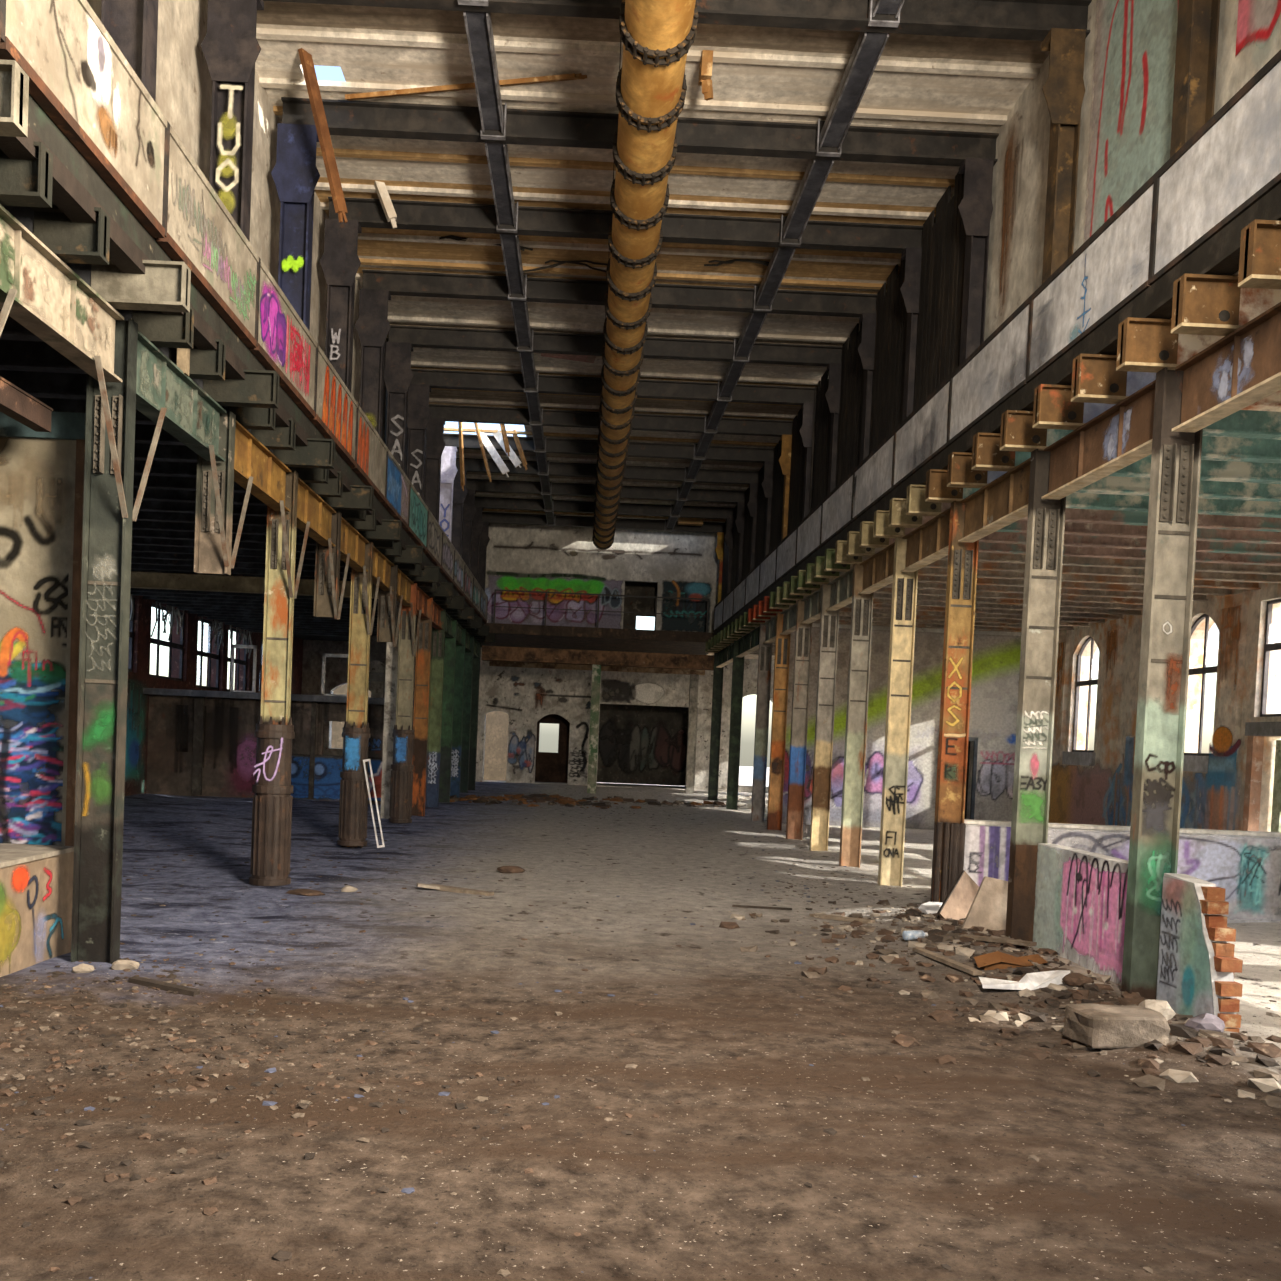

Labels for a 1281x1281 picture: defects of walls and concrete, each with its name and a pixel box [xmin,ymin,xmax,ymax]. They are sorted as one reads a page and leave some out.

peeling [1213,339,1253,401]
peeling [1103,410,1132,460]
spalling [1199,886,1243,1032]